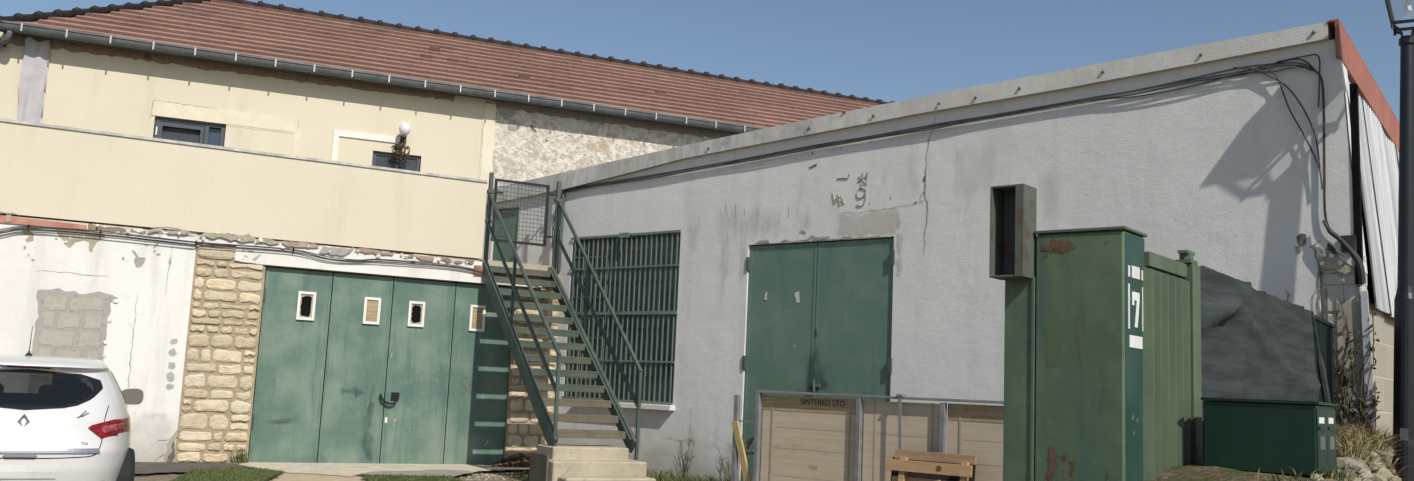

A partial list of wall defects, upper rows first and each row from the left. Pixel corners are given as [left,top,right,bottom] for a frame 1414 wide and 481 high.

peeling [31,288,118,361]